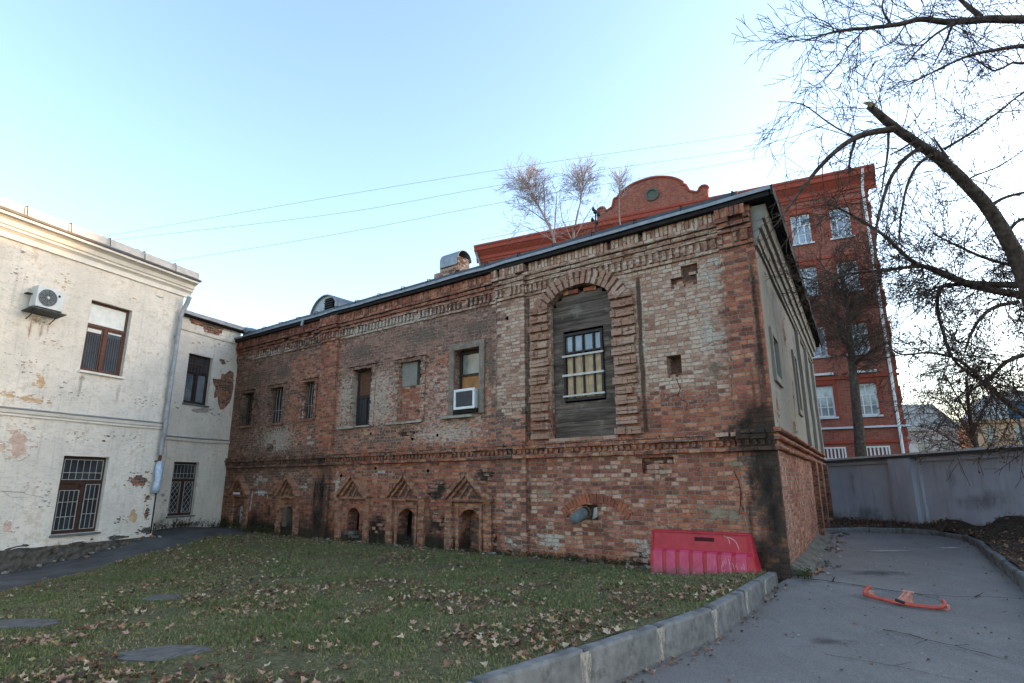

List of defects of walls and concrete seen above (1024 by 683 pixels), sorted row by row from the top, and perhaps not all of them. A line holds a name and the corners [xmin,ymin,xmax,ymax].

flaking render [189,319,226,347]
peeling [0,351,86,405]
flaking render [173,359,234,422]
peeling [0,422,40,461]
flaking render [107,470,168,540]